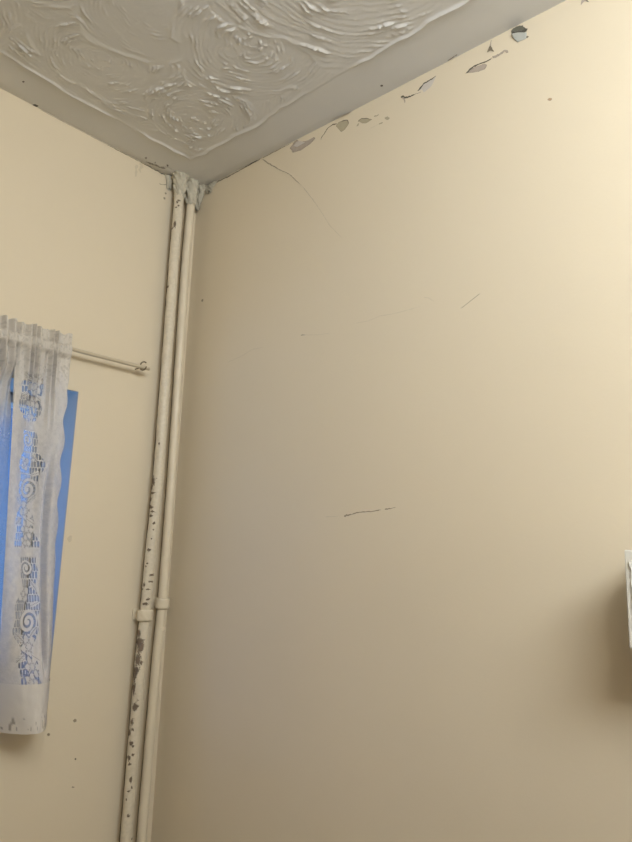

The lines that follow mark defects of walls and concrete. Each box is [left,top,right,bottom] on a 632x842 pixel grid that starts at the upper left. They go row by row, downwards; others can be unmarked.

peeling [511,25,529,42]
peeling [466,40,508,73]
peeling [401,77,435,102]
peeling [291,112,389,152]